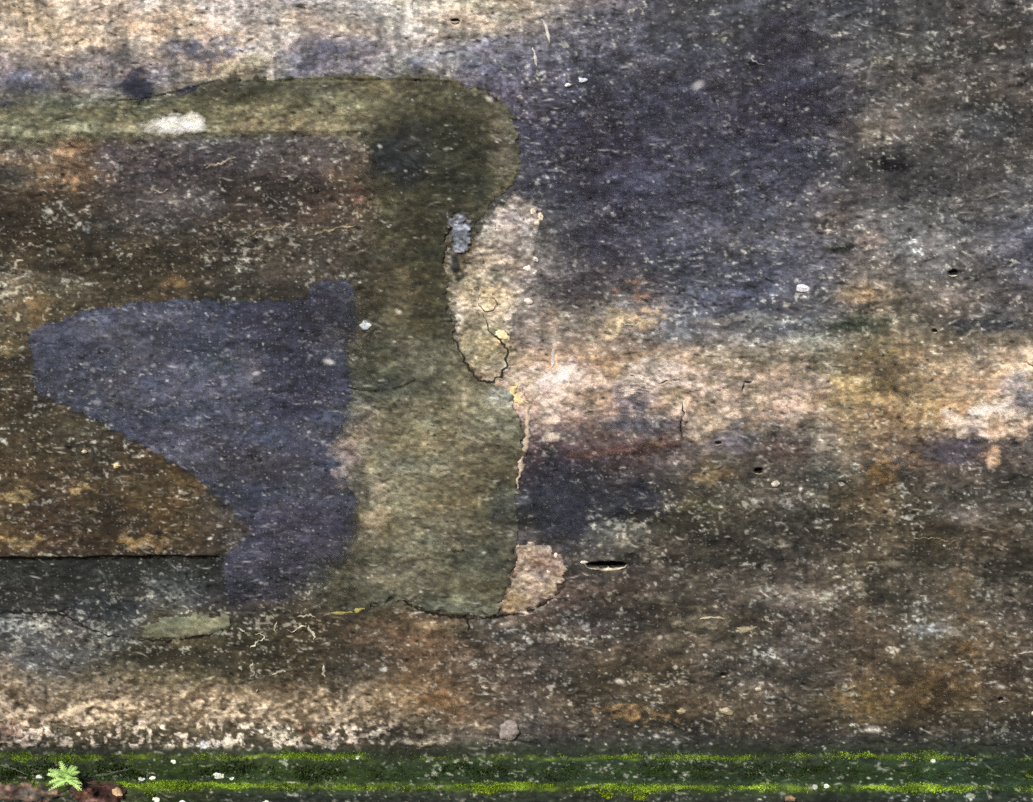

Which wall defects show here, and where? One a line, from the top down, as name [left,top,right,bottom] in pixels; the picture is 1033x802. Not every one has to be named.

leakage [28,278,362,602]
crack [373,587,564,632]
spalling [445,196,543,489]
spalling [498,542,568,615]